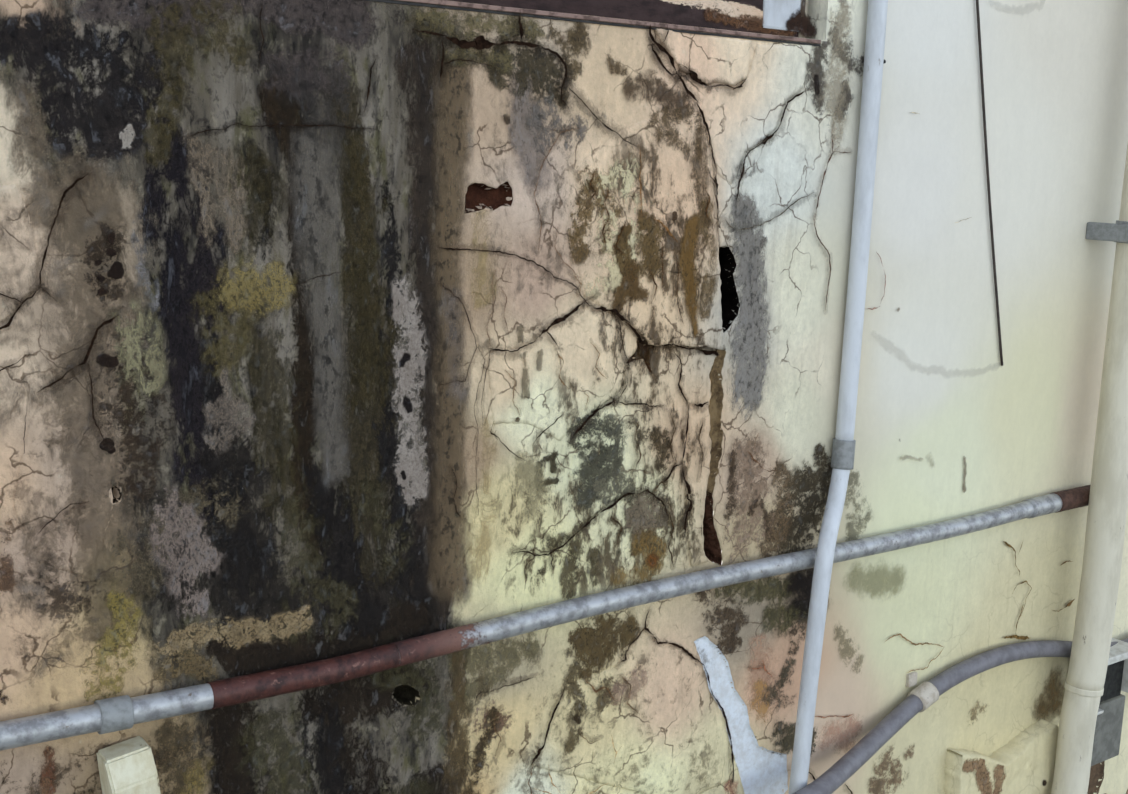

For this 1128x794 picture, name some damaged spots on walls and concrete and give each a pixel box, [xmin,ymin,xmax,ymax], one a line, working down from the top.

crack [0,174,87,330]
damp [0,0,591,692]
flaking render [465,182,513,213]
crack [414,16,719,569]
flaking render [719,247,740,333]
crack [649,24,850,309]
peeling [14,378,121,578]
flaking render [569,348,726,566]
damp [724,437,832,561]
damp [152,634,540,794]
crack [528,611,734,794]
damp [695,568,814,755]